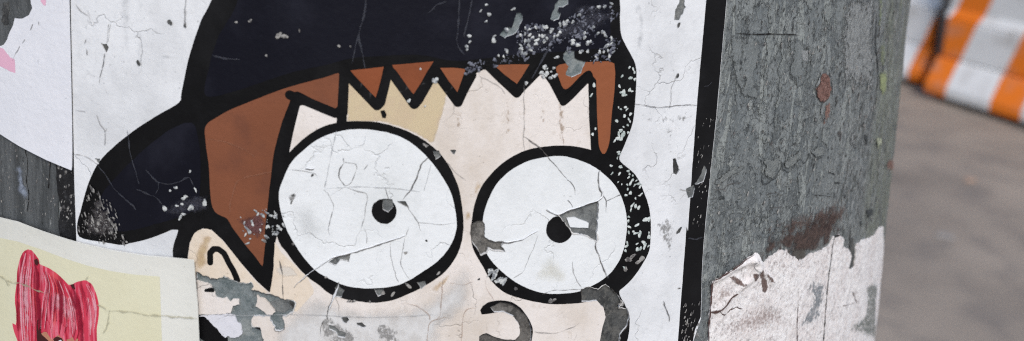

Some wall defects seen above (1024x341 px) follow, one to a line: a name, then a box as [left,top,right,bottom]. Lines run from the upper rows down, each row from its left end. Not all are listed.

rust [815,71,834,124]
rust [761,206,844,261]